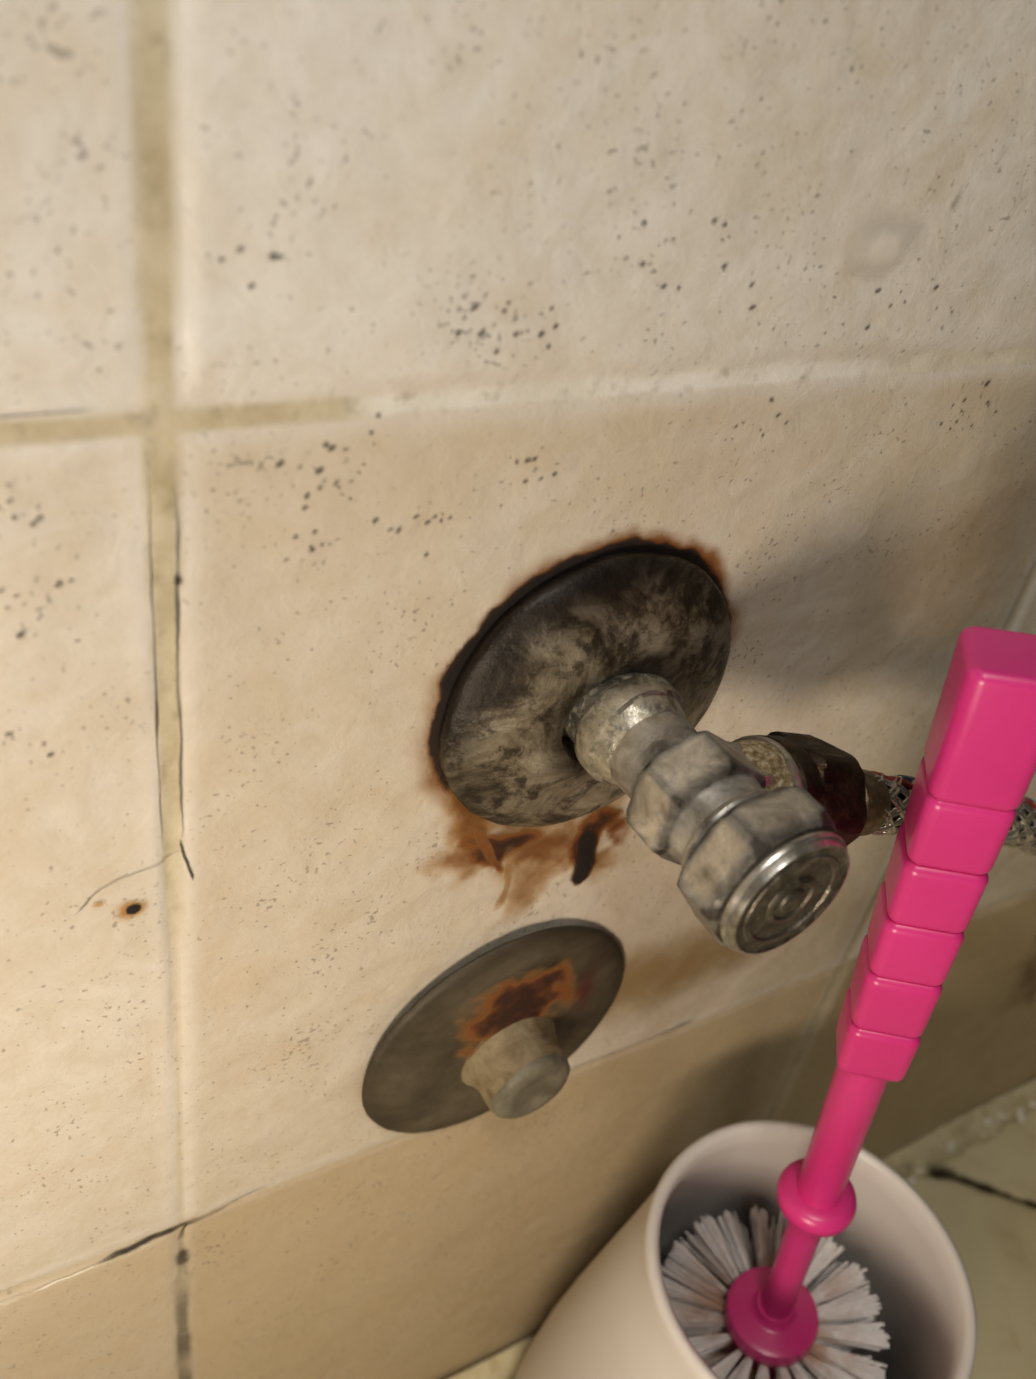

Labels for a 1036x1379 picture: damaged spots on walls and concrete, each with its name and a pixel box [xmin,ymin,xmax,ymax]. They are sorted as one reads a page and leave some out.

crack [149,524,194,879]
corrosion [427,533,735,905]
corrosion [120,902,145,917]
corrosion [460,962,590,1058]